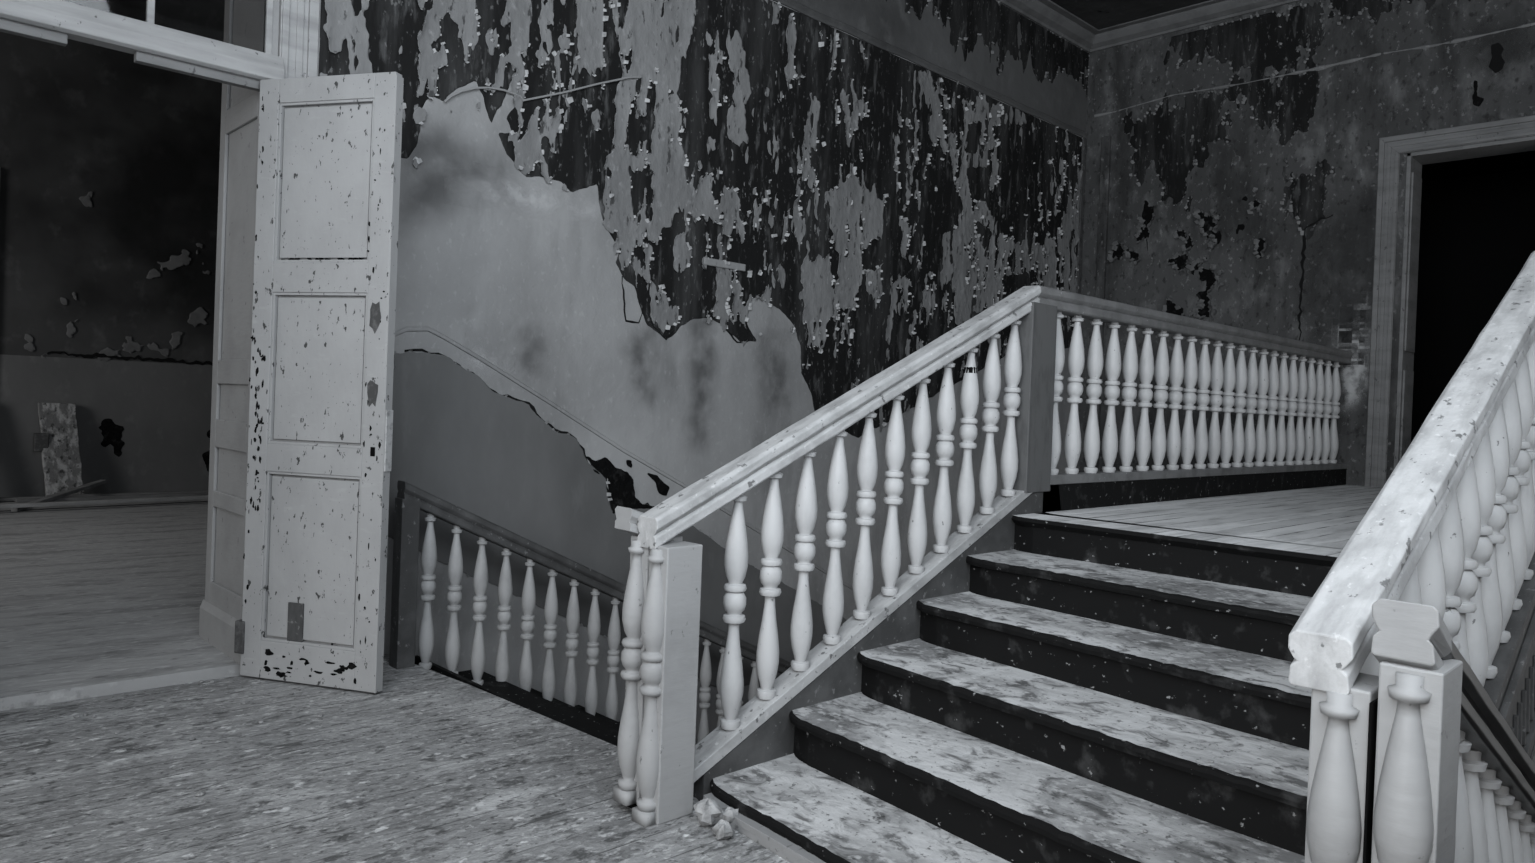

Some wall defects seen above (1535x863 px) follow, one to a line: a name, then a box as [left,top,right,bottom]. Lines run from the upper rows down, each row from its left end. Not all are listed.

spalling [1472,80,1484,107]
peeling [1107,0,1436,320]
peeling [318,0,1090,411]
flaking render [146,243,210,279]
peeling [281,222,374,274]
flaking render [97,307,208,362]
peeling [845,325,1011,438]
spalling [99,418,125,457]
spalling [202,429,211,472]
peeling [248,329,266,533]
spalling [545,421,669,514]
peeling [263,643,367,684]